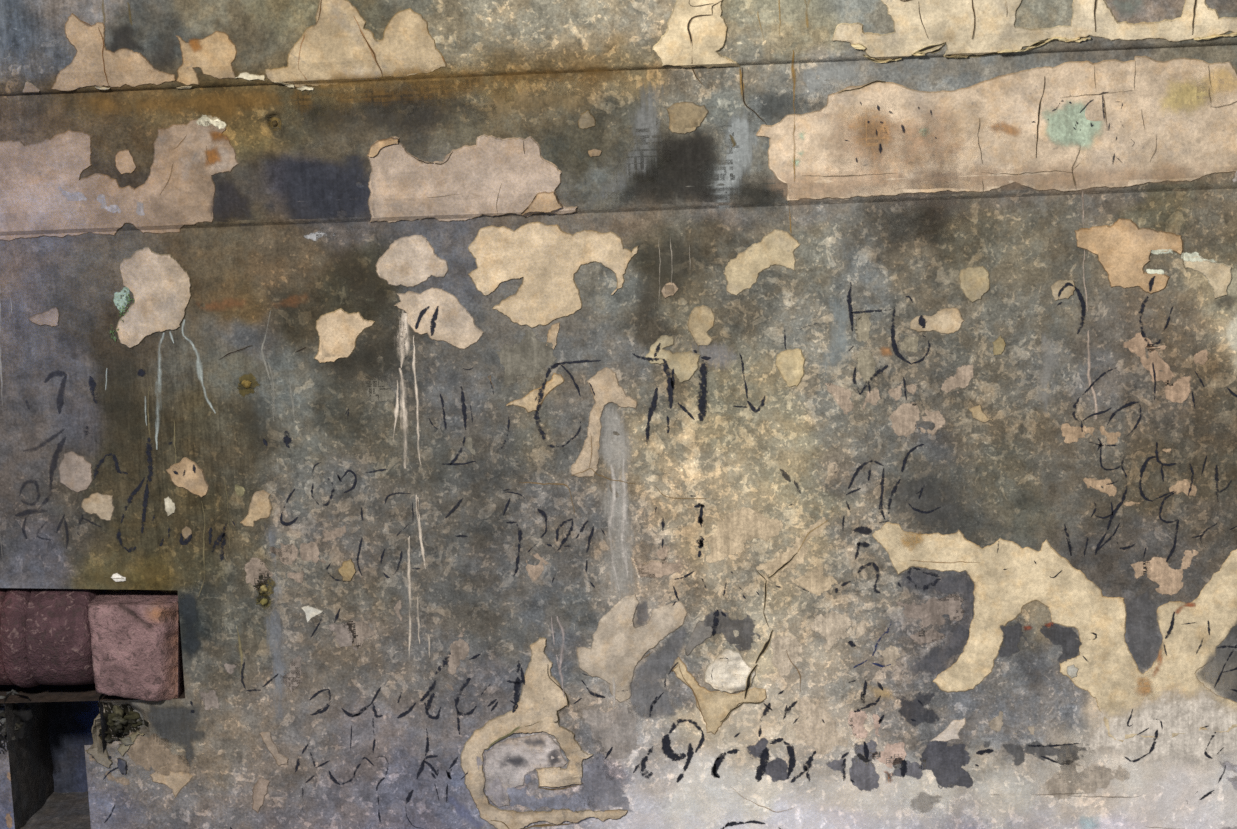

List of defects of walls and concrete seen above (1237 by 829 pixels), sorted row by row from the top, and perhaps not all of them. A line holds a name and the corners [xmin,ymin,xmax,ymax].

peeling [23,0,446,94]
peeling [831,0,1237,63]
leakage [196,115,226,129]
peeling [756,56,1237,201]
peeling [0,119,239,348]
peeling [366,134,639,413]
leakage [1151,249,1215,262]
leakage [1218,296,1233,307]
leakage [1087,330,1097,417]
peeling [810,610,867,650]
spalling [872,522,1237,742]
spalling [460,594,767,829]